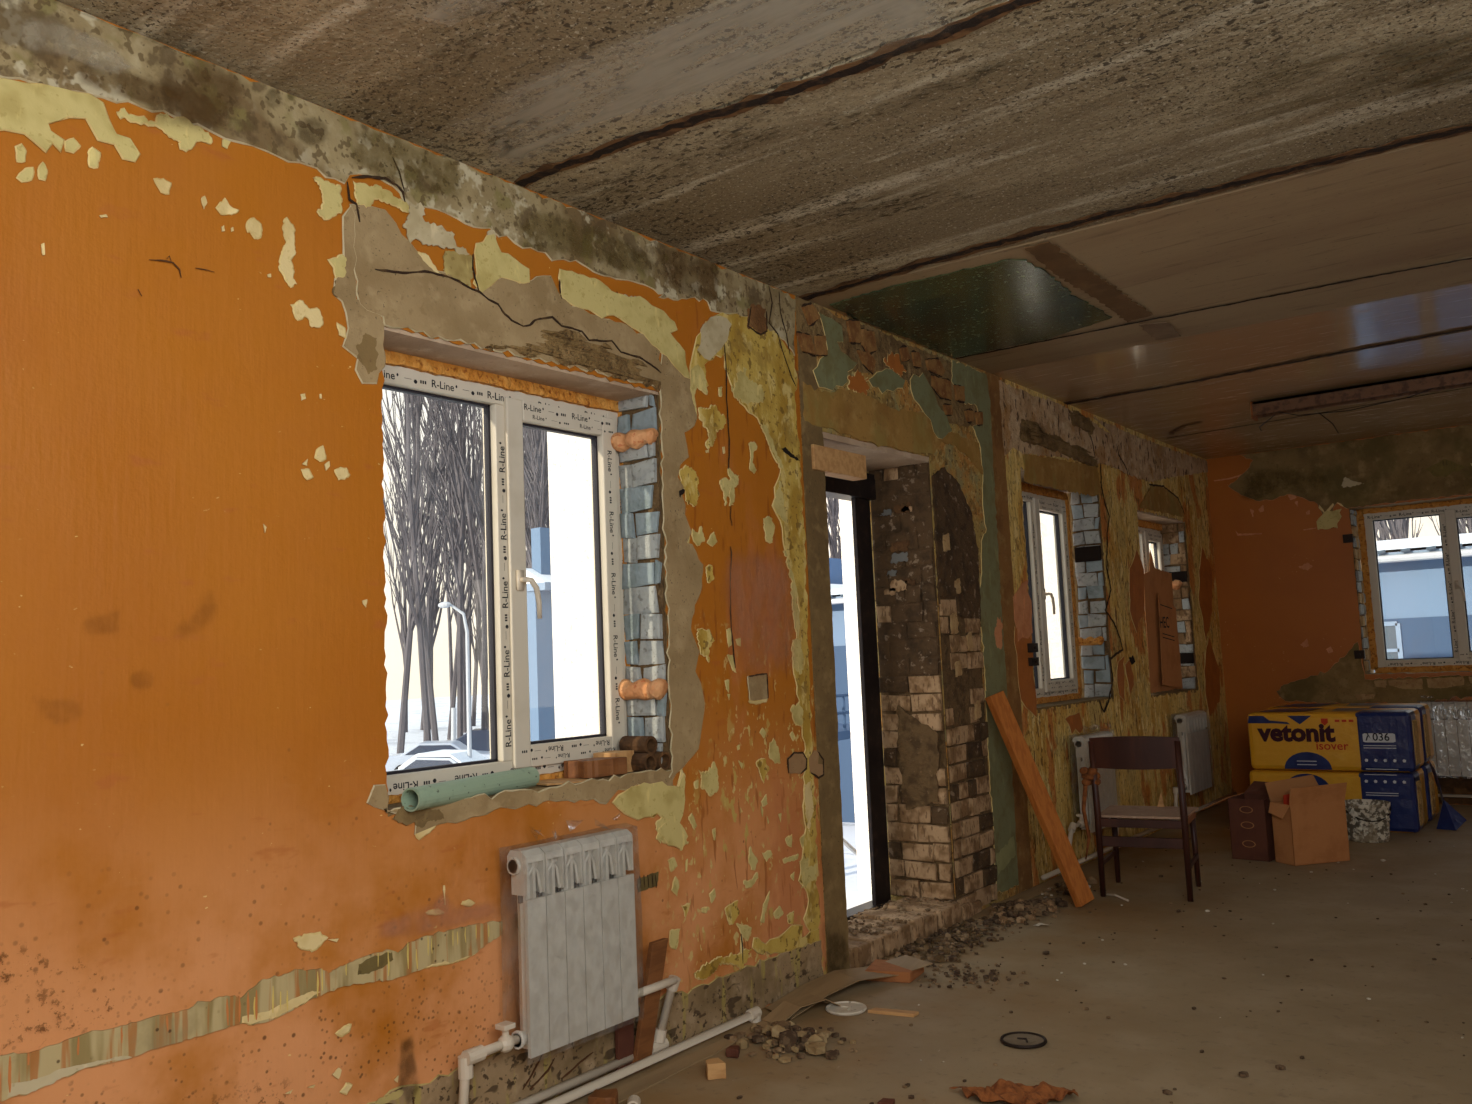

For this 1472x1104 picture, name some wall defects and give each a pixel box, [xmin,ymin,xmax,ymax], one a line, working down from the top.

crack [347,157,406,222]
crack [375,254,661,373]
flaking render [0,0,1208,1047]
peeling [1288,494,1347,530]
peeling [1198,547,1220,717]
flaking render [1277,639,1472,704]
flaking render [1437,765,1472,805]
peeling [0,885,503,1102]
flaking render [367,1025,616,1104]